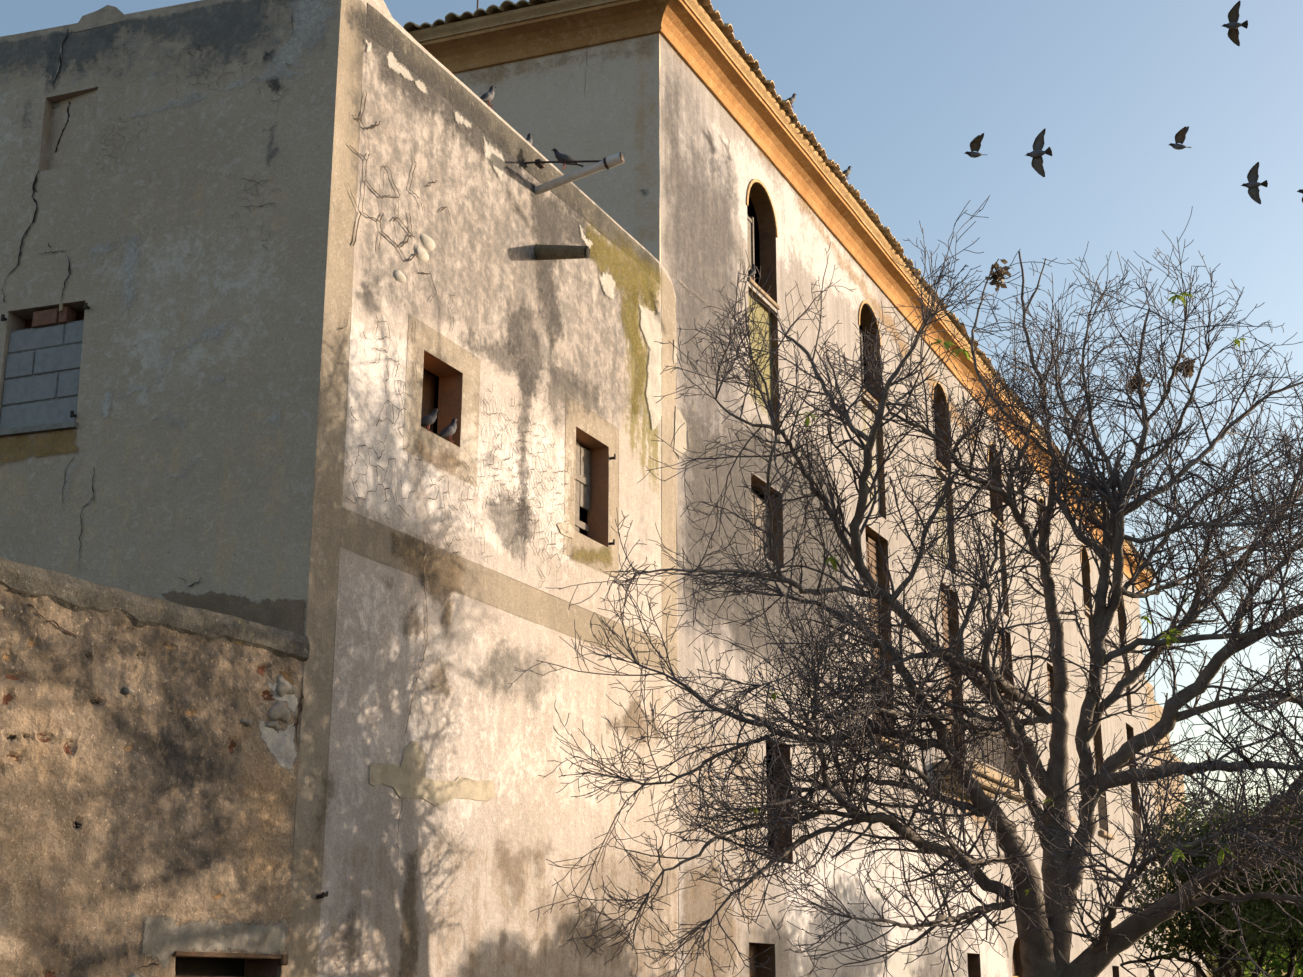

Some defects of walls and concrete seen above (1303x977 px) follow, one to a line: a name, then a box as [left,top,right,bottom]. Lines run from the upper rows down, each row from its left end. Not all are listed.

crack [2,28,72,302]
damp [348,12,599,553]
damp [621,293,655,414]
crack [338,93,575,762]
crack [60,457,95,569]
spalling [162,591,306,635]
damp [441,600,452,627]
spalling [257,665,298,773]
damp [399,855,419,977]